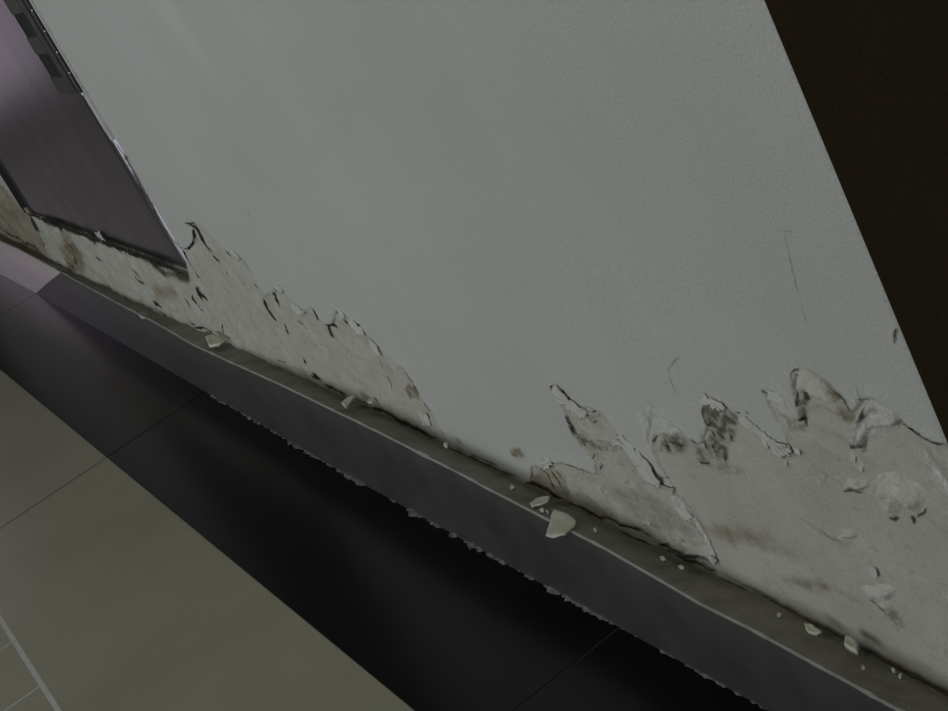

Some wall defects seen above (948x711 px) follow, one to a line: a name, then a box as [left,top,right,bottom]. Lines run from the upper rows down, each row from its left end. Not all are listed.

peeling [0,184,449,445]
peeling [530,369,948,691]